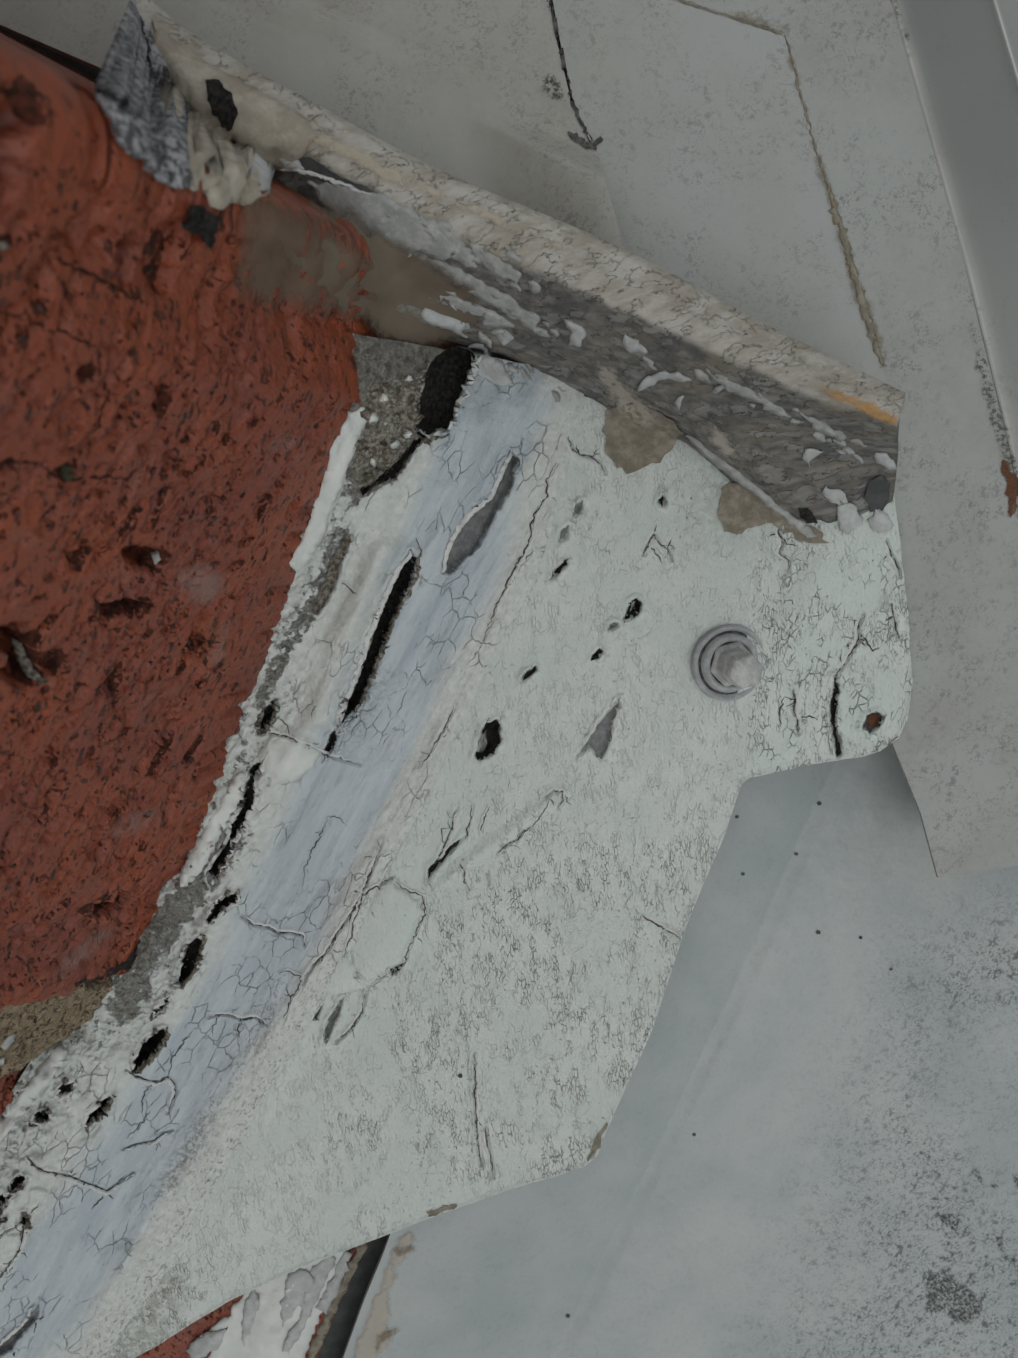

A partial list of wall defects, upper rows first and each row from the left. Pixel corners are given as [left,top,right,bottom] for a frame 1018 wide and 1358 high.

peeling [307,180,586,386]
spalling [602,334,897,474]
crack [484,437,604,641]
crack [643,527,674,563]
spalling [718,483,829,543]
rust [1001,460,1018,516]
crack [778,540,901,756]
spalling [577,698,620,759]
spalling [863,711,882,733]
crack [438,787,570,888]
crack [0,842,429,1279]
peeling [185,1242,370,1358]